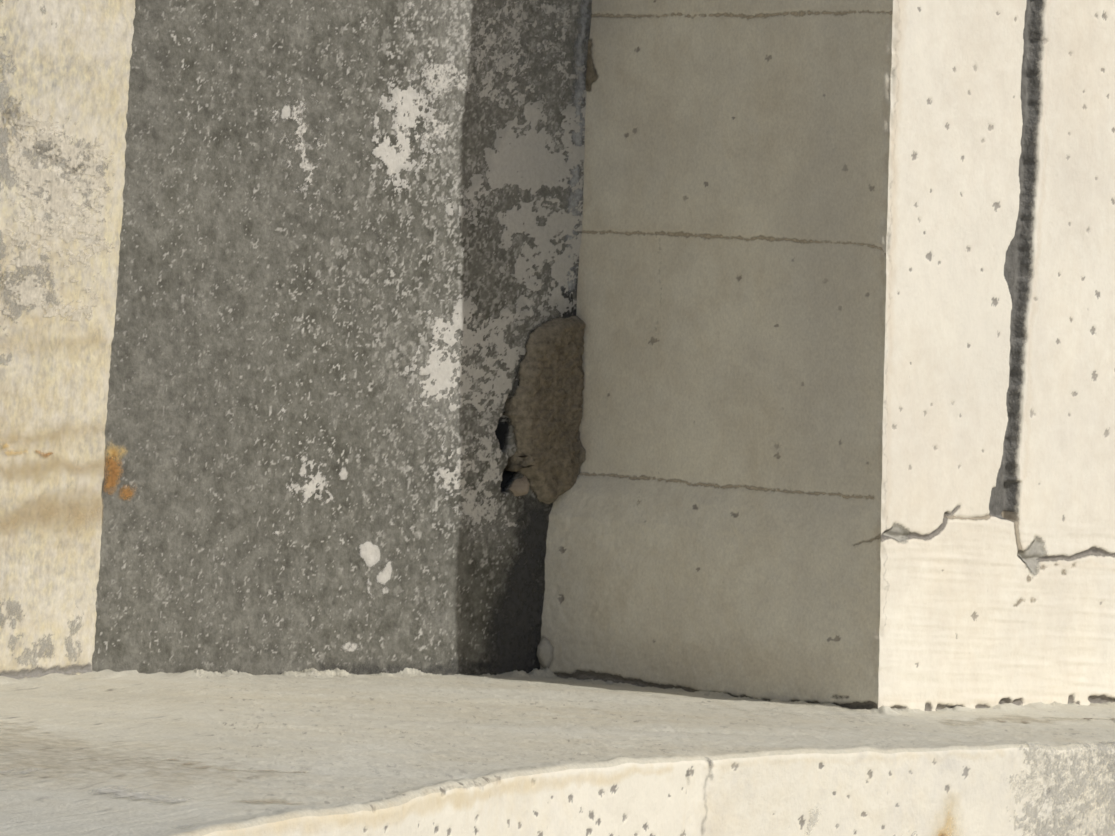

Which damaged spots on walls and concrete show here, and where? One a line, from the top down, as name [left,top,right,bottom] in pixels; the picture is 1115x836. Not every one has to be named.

crack [591,11,892,19]
peeling [270,93,329,212]
crack [581,230,886,256]
peeling [359,0,598,550]
crack [856,0,1115,563]
rust [105,447,133,499]
peeling [286,455,348,508]
crack [579,473,874,499]